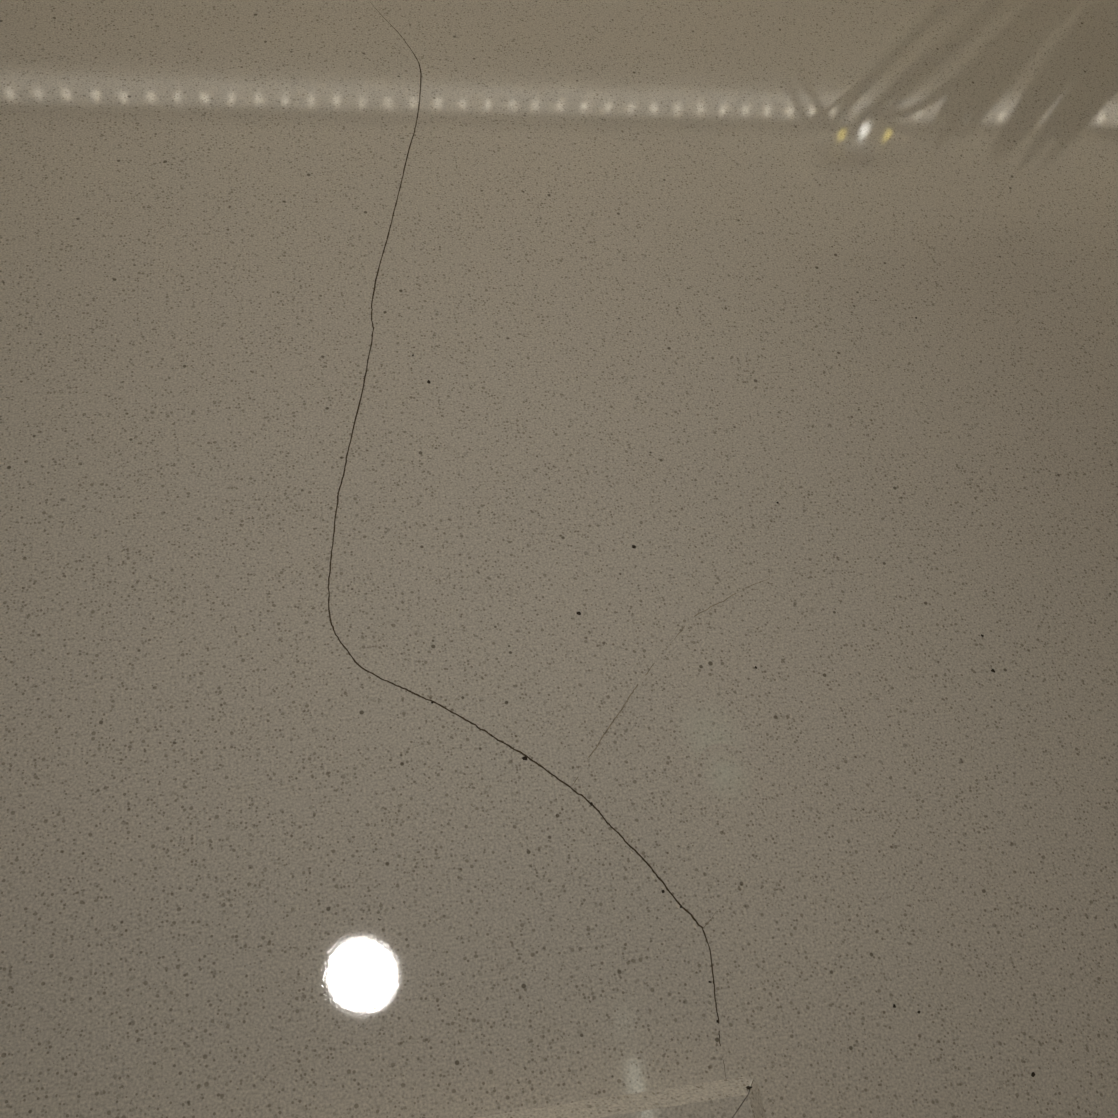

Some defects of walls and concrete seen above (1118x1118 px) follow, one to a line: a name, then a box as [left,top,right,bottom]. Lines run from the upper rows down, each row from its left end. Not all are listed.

crack [328,3,818,1076]